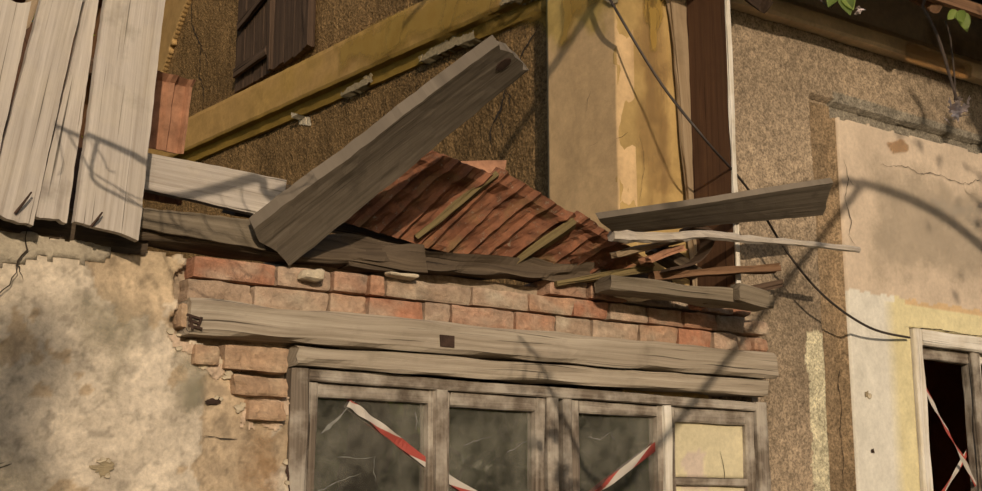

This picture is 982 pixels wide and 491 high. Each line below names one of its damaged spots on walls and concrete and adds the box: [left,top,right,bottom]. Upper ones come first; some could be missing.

crack [490,91,511,147]
crack [0,227,29,293]
flaking render [166,328,194,354]
flaking render [198,356,233,381]
flaking render [205,395,223,405]
flaking render [233,396,290,431]
flaking render [89,457,114,478]